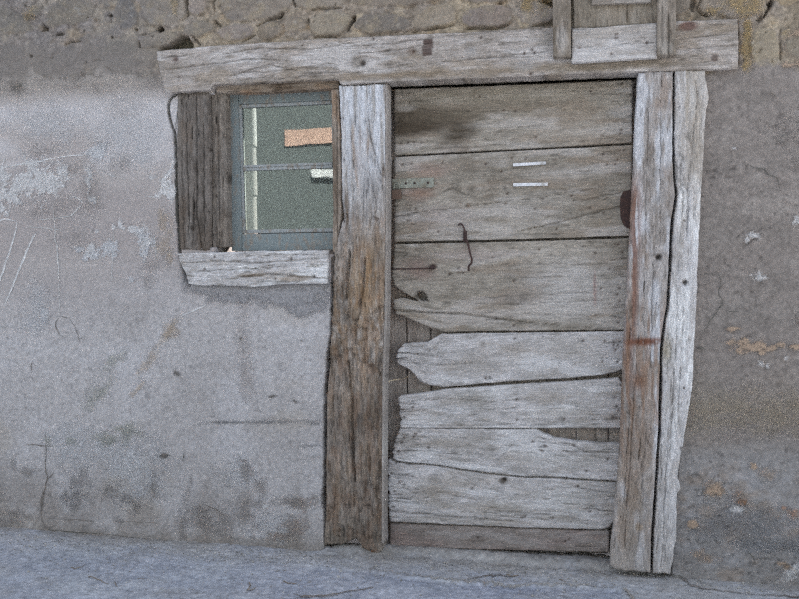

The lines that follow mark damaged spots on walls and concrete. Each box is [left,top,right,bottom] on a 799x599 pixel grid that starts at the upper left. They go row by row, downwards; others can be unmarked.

peeling [0,158,70,216]
peeling [74,220,155,263]
spalling [726,327,799,359]
crack [27,434,154,539]